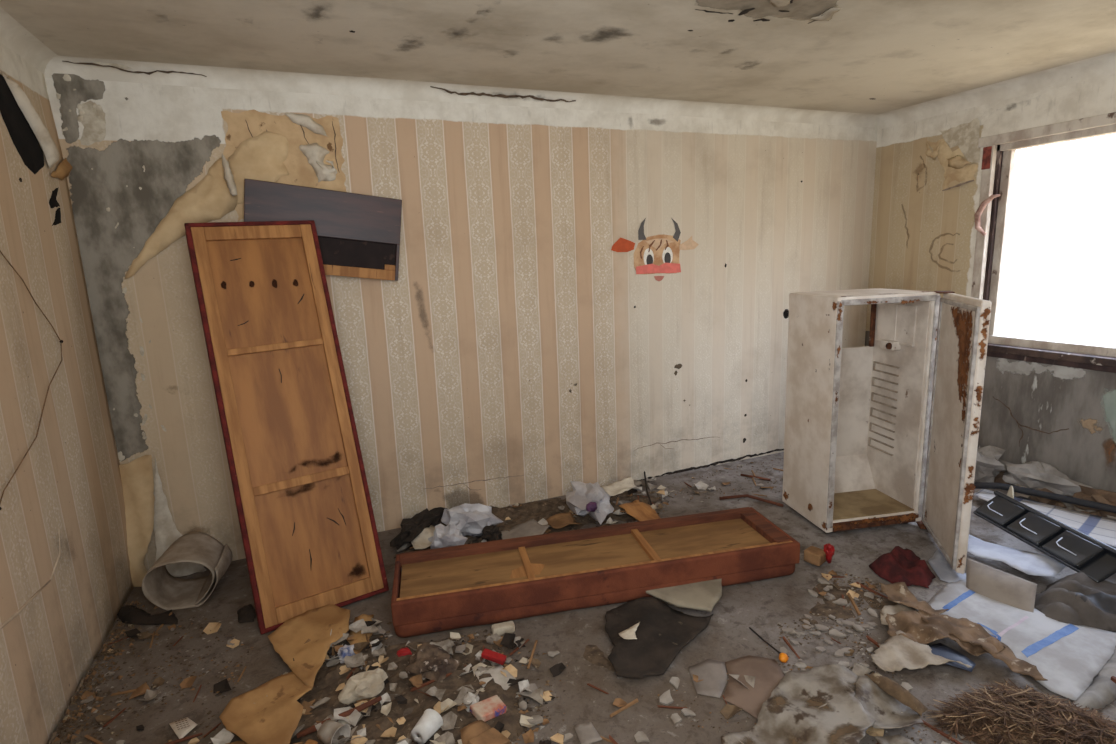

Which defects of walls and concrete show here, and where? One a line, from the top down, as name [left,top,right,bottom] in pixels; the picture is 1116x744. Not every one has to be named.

peeling [695,0,841,24]
crack [62,61,207,77]
crack [430,86,576,102]
peeling [926,118,992,191]
peeling [124,110,347,280]
peeling [1080,390,1116,443]
corrosion [1103,440,1116,463]